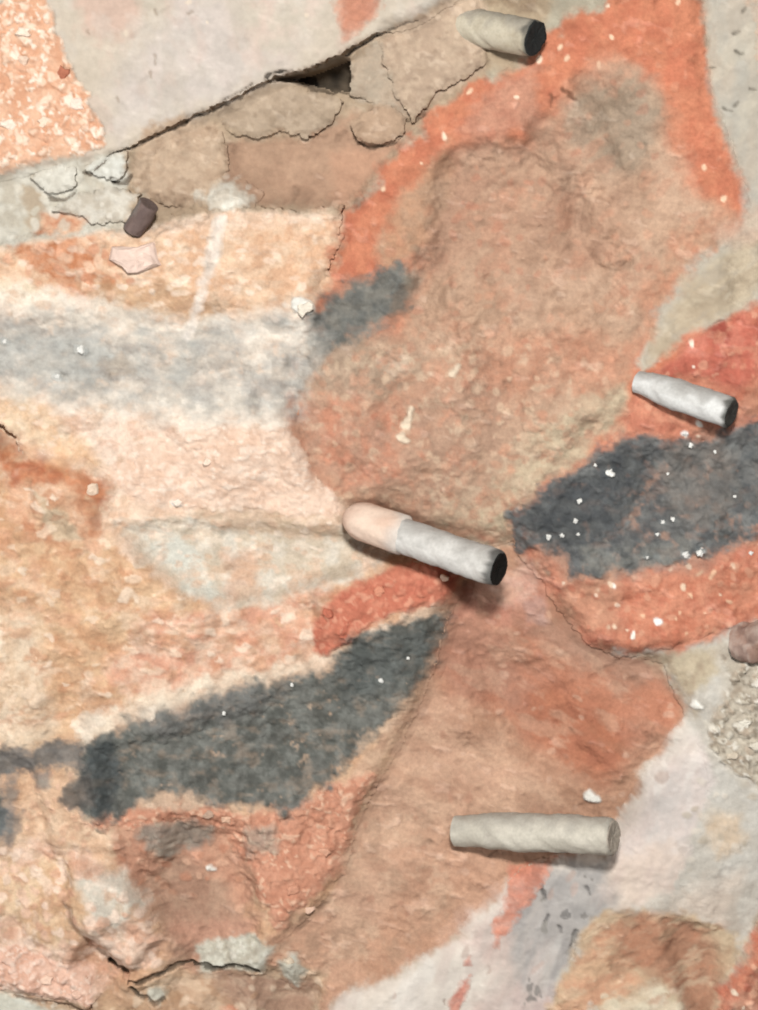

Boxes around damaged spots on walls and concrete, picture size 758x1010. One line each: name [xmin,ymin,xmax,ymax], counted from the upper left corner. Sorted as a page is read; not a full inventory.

crack [48,20,426,202]
crack [107,956,261,1008]